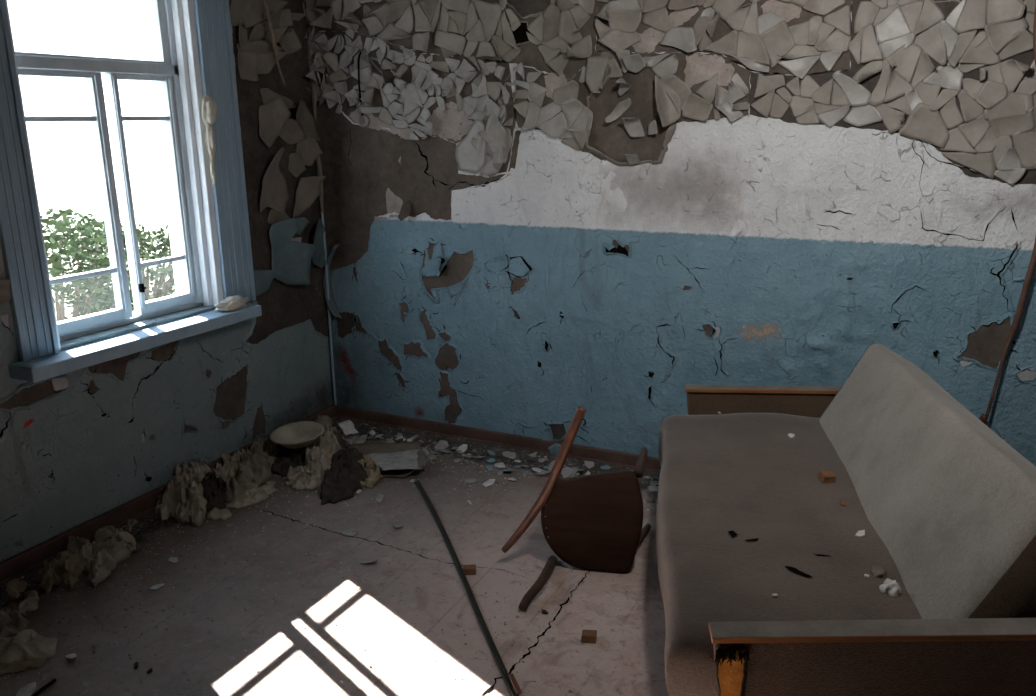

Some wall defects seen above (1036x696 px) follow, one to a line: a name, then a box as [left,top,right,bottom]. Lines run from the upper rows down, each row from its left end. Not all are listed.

peeling [229,0,1036,424]
crack [817,209,856,231]
crack [872,128,1032,313]
crack [888,284,927,321]
peeling [0,340,179,413]
peeling [202,363,269,438]
peeling [542,421,570,442]
peeling [482,462,506,487]
crack [481,570,590,696]